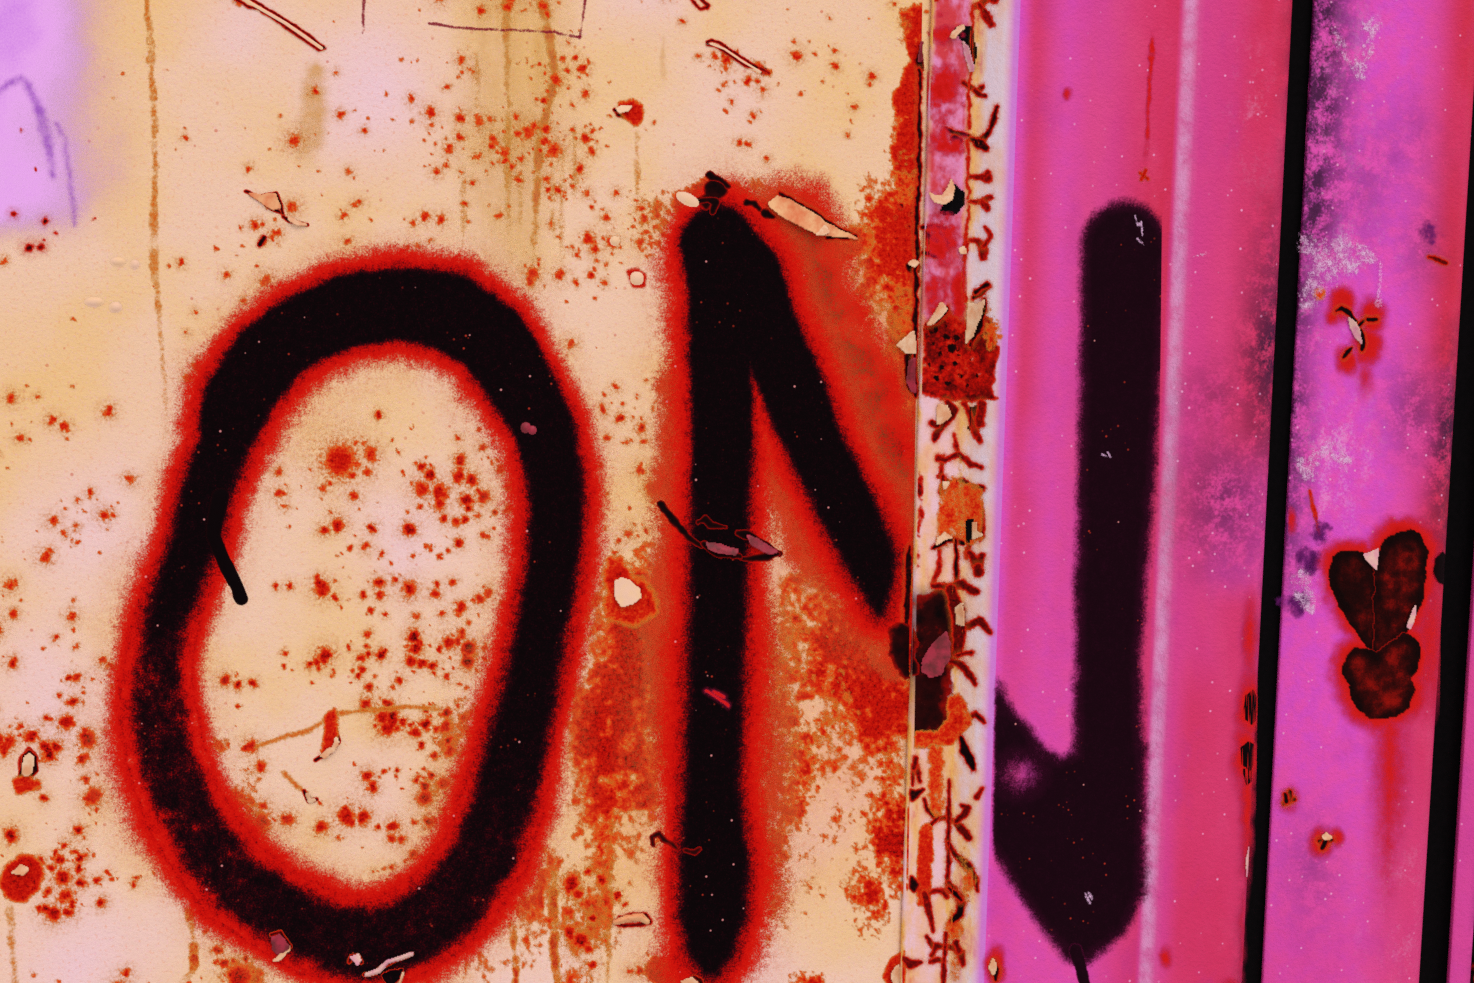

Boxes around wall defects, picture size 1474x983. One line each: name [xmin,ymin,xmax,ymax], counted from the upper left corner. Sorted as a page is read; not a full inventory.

peeling [768,190,859,241]
corrosion [832,0,1003,435]
corrosion [1313,287,1386,387]
corrosion [0,598,155,925]
corrosion [212,428,510,873]
corrosion [463,506,663,983]
peeling [614,577,641,607]
peeling [706,535,778,556]
corrosion [765,551,972,944]
peeling [888,603,965,680]
corrosion [911,465,984,594]
corrosion [1319,517,1445,863]